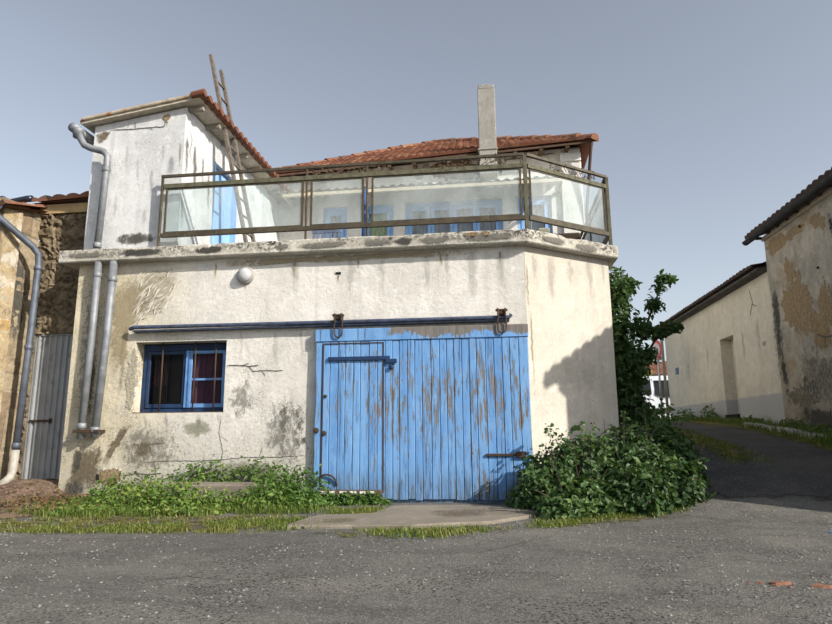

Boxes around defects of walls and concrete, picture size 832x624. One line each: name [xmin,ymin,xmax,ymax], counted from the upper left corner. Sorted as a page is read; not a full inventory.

crack [107,122,166,135]
spalling [415,159,479,182]
leakage [118,232,153,244]
spalling [766,212,832,350]
leakage [772,291,790,401]
crack [227,363,283,375]
leakage [65,428,127,495]